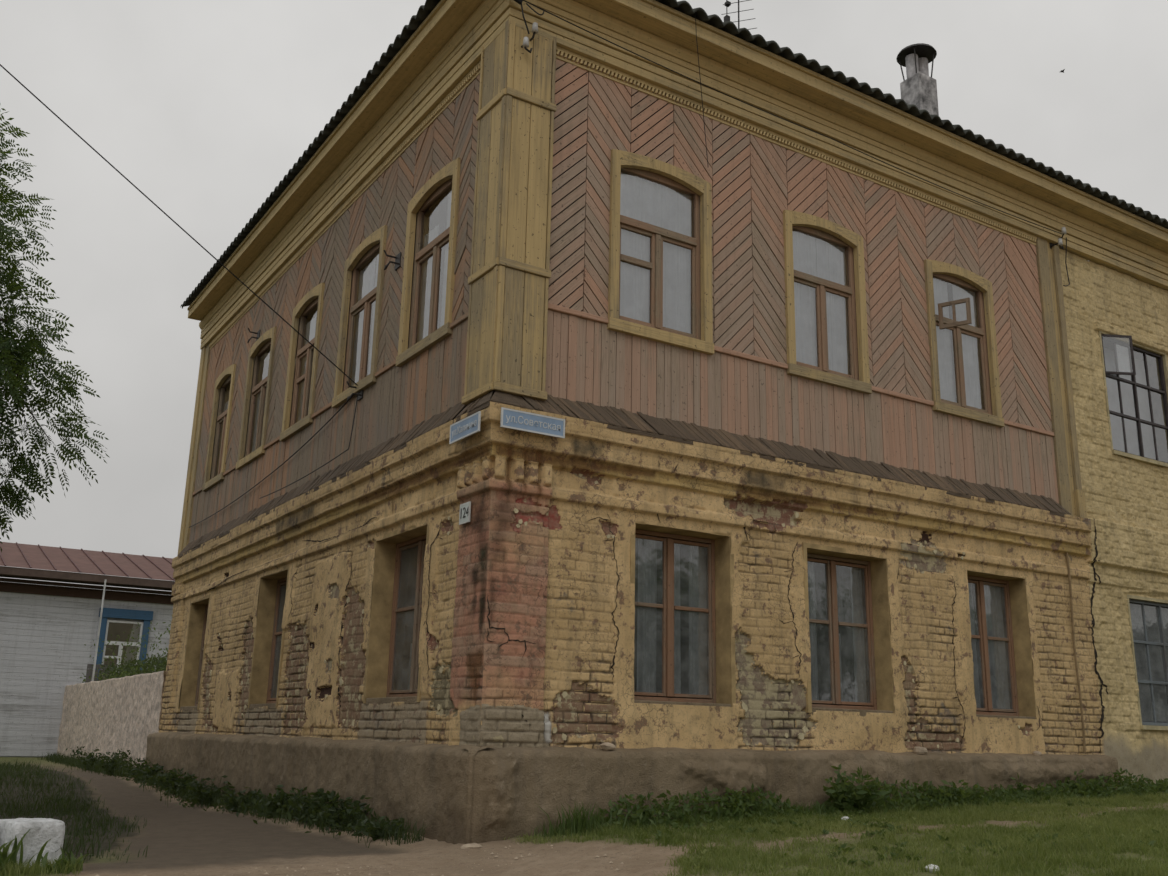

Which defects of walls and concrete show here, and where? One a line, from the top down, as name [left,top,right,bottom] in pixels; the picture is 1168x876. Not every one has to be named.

peeling [510,497,562,533]
spalling [724,491,808,533]
spalling [282,580,366,738]
crack [423,519,442,676]
spalling [544,680,623,747]
spalling [735,628,818,750]
spalling [901,655,966,752]
crack [1091,519,1108,751]